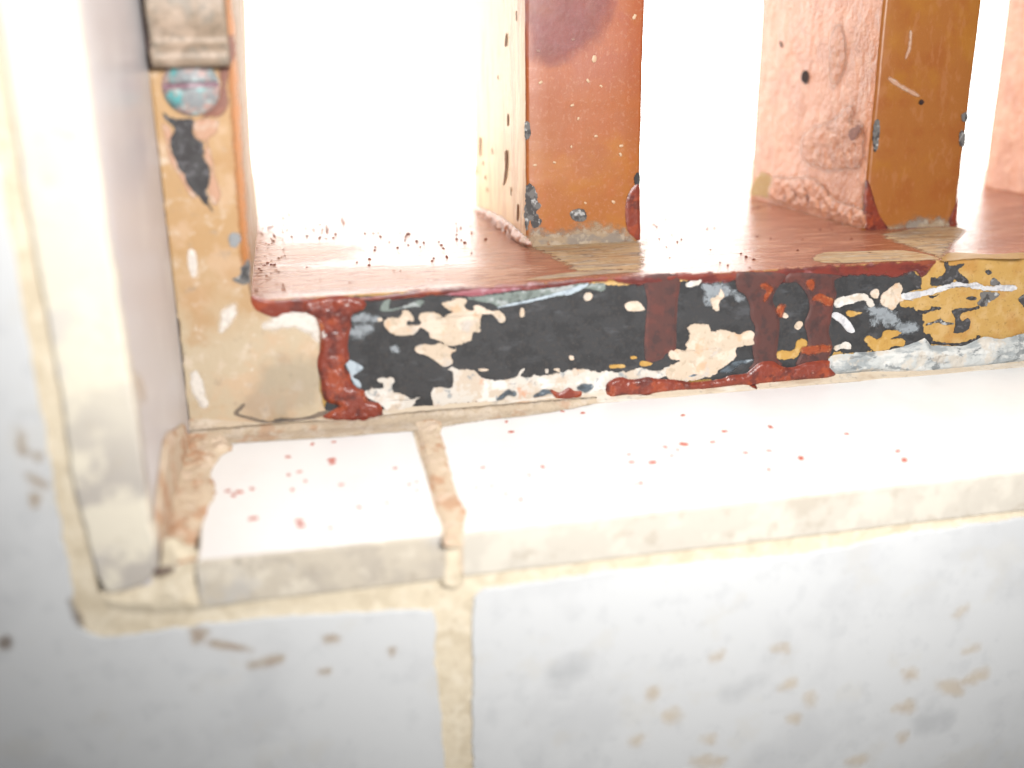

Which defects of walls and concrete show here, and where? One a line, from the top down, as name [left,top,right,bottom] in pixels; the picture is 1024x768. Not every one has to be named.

peeling [163,112,221,212]
peeling [344,270,755,411]
peeling [773,282,810,367]
peeling [813,250,1024,357]